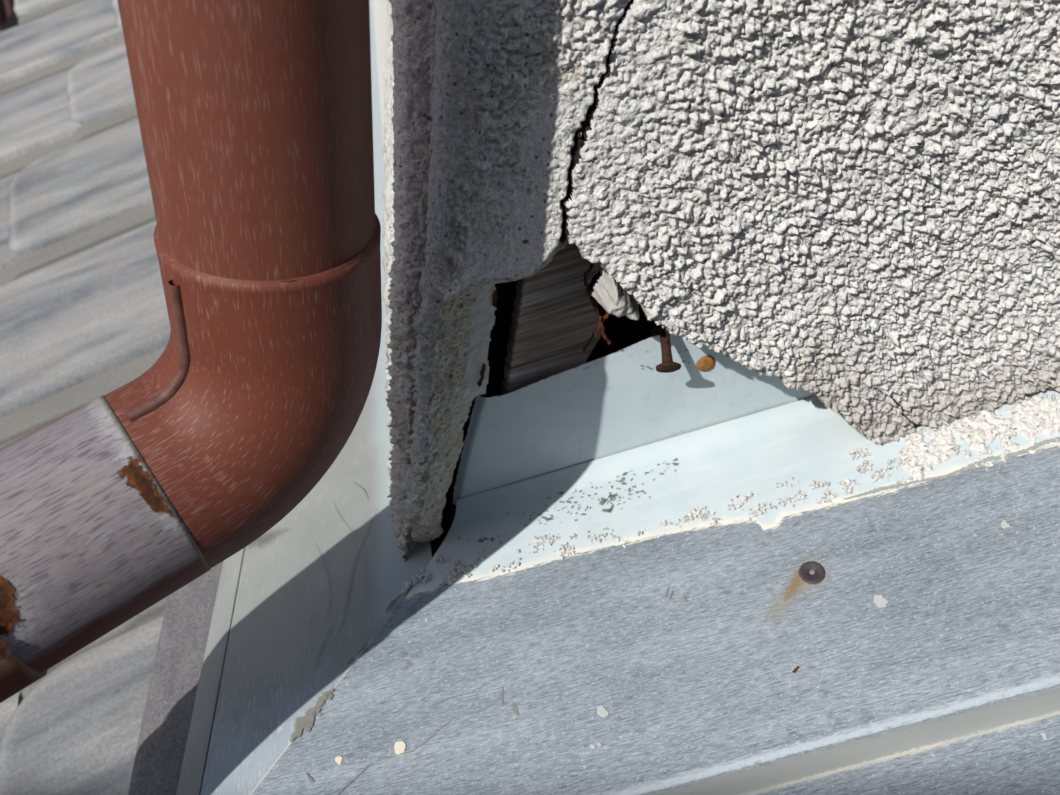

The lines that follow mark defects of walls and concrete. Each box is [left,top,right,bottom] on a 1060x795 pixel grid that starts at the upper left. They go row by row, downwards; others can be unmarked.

crack [560,0,633,246]
spalling [398,234,760,561]
spalling [773,375,876,444]
corrosion [117,452,172,518]
corrosion [0,576,23,659]